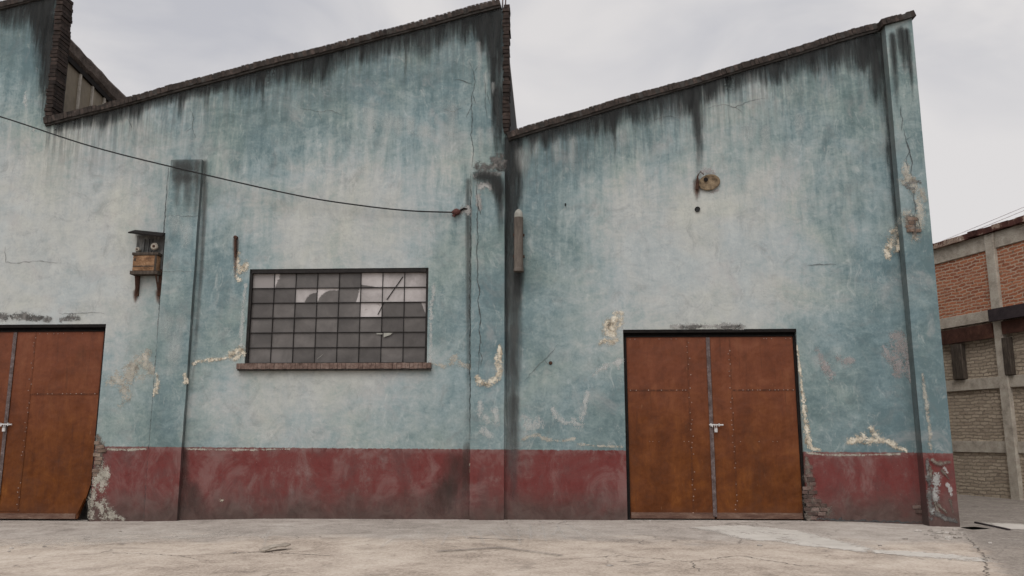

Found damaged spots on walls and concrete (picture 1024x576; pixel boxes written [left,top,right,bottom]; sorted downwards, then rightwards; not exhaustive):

crack [442,68,490,420]
damp [55,8,912,451]
flaking render [473,153,507,211]
flaking render [884,162,927,260]
crack [900,108,920,228]
peeling [182,347,246,384]
peeling [432,344,503,388]
peeling [598,311,624,345]
peeling [88,434,146,521]
flaking render [796,345,908,521]
peeling [883,331,958,523]